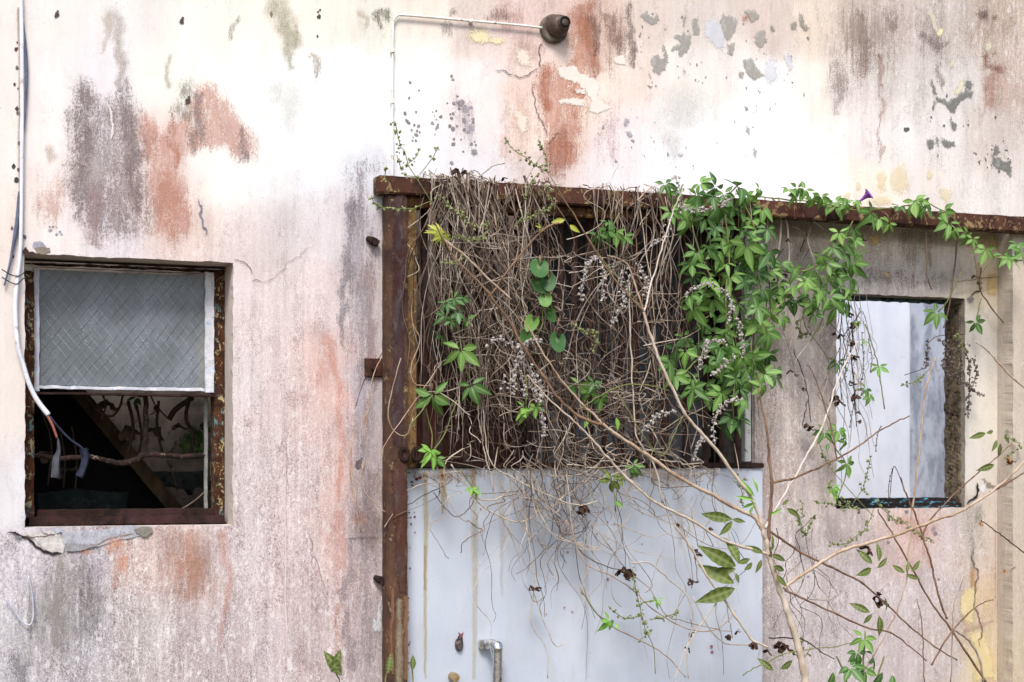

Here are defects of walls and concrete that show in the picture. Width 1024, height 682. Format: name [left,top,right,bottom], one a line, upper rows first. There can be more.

water stain [62,15,159,246]
crack [495,44,558,143]
rust [518,2,601,181]
peeling [557,65,611,113]
peeling [639,9,795,113]
peeling [790,12,810,40]
peeling [926,80,976,157]
peeling [973,140,1012,177]
crack [235,245,313,282]
water stain [336,161,379,666]
rust [390,194,481,680]
flaking render [7,525,152,555]